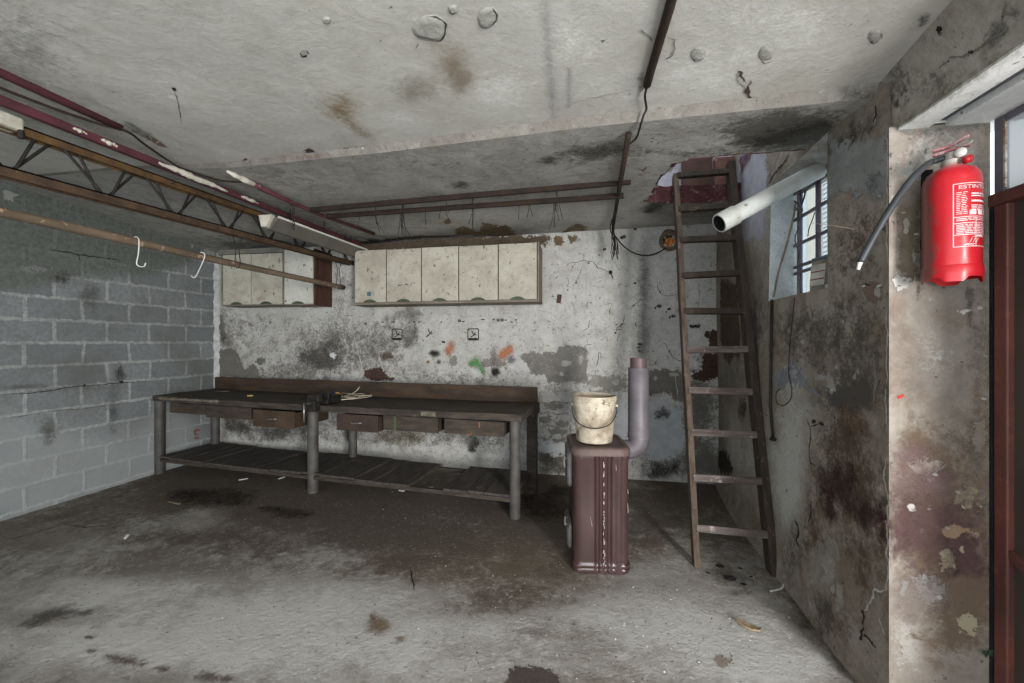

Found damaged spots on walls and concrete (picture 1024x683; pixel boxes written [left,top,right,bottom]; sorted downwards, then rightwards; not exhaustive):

crack [54,250,117,260]
leakage [299,338,341,368]
peeling [363,366,395,381]
crack [2,366,151,418]
peeling [481,342,628,442]
leakage [648,462,679,478]
peeling [907,455,946,482]
peeling [953,486,985,509]
leakage [818,448,989,606]
peeling [938,523,980,572]
peeling [956,613,981,639]